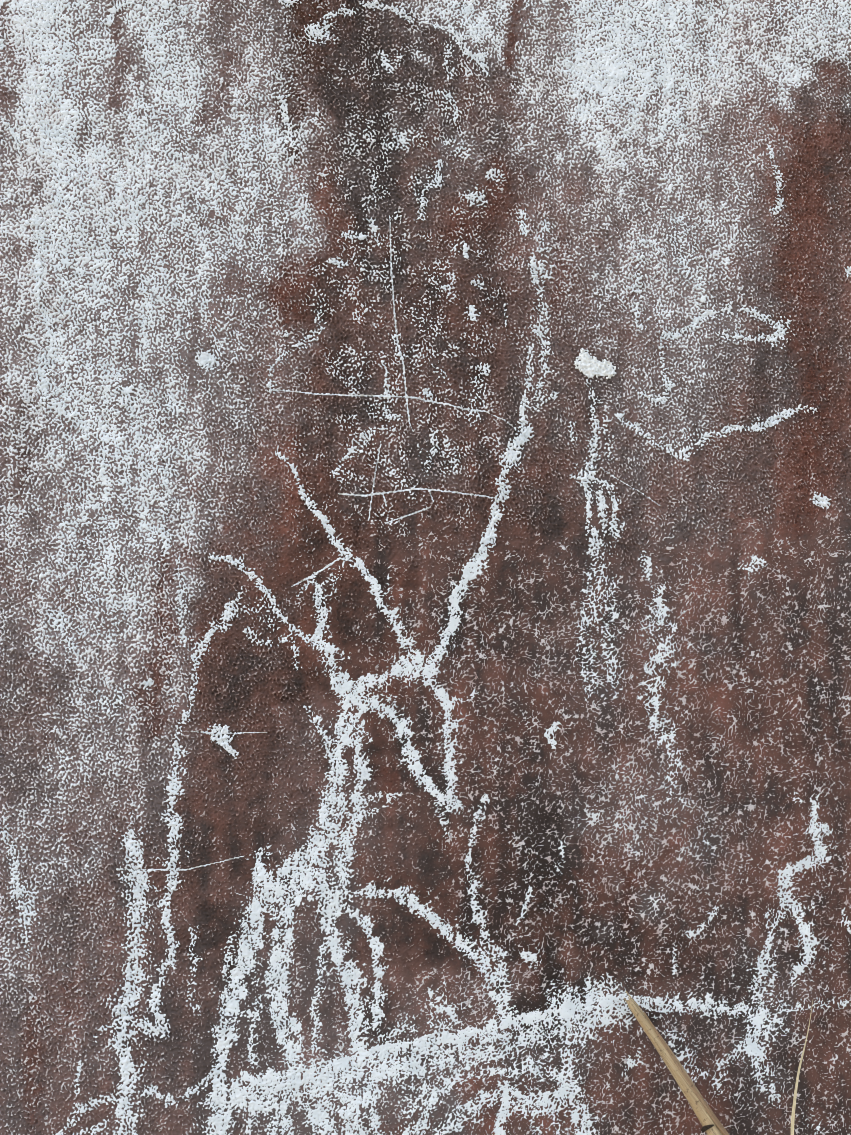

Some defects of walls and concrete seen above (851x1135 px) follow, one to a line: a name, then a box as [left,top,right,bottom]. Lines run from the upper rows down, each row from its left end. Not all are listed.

efflorescence [0,118,29,156]
efflorescence [320,0,415,32]
efflorescence [372,0,851,221]
efflorescence [14,0,316,663]
damp [52,206,851,1135]